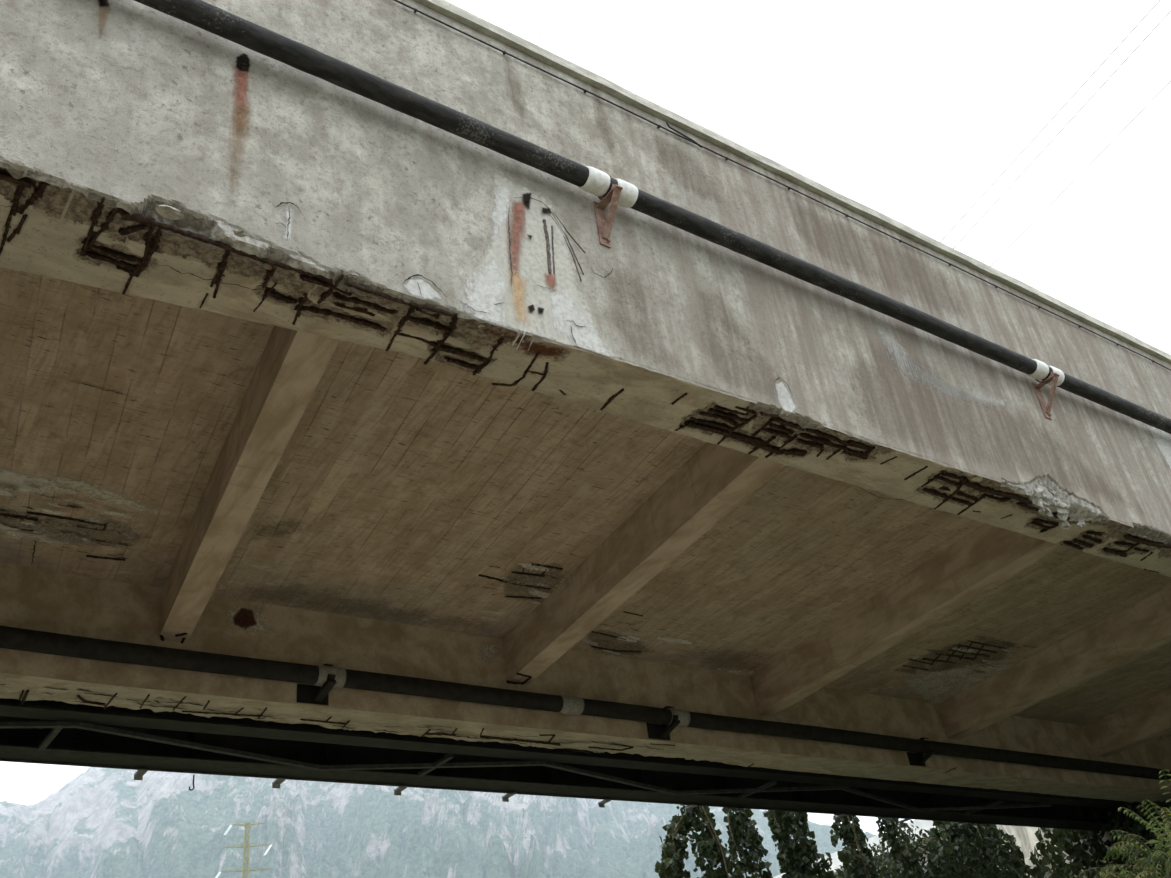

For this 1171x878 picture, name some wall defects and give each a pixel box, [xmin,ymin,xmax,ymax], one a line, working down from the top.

rust [235,53,250,149]
spalling [0,159,567,391]
rust [510,202,525,319]
spalling [516,197,585,281]
spalling [675,402,897,465]
spalling [0,469,157,565]
spalling [904,466,1171,573]
spalling [478,563,566,605]
spalling [45,687,285,723]
spalling [300,717,354,729]
spalling [414,725,675,754]
spalling [896,636,1036,704]